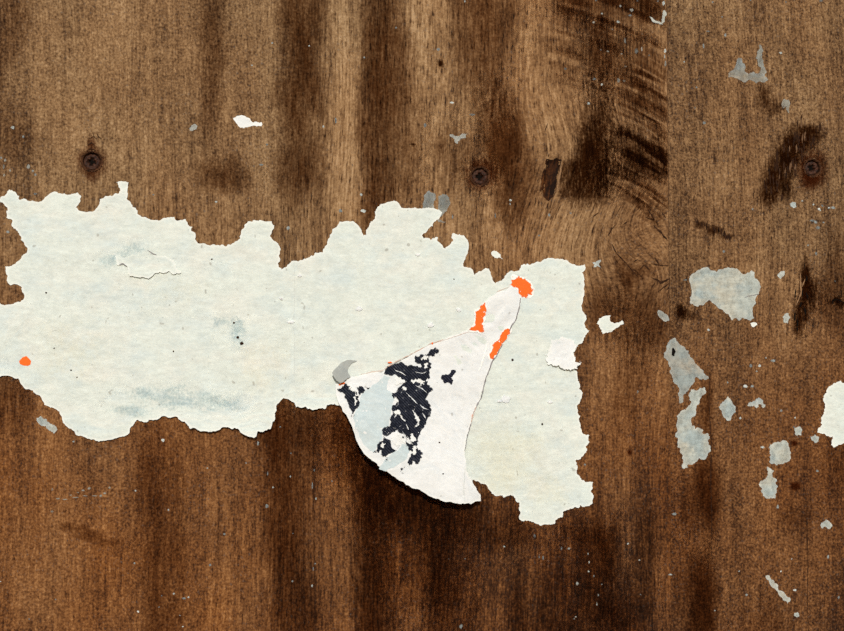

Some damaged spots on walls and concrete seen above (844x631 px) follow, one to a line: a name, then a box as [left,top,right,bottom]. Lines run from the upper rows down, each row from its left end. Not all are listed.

peeling [349,375,425,471]